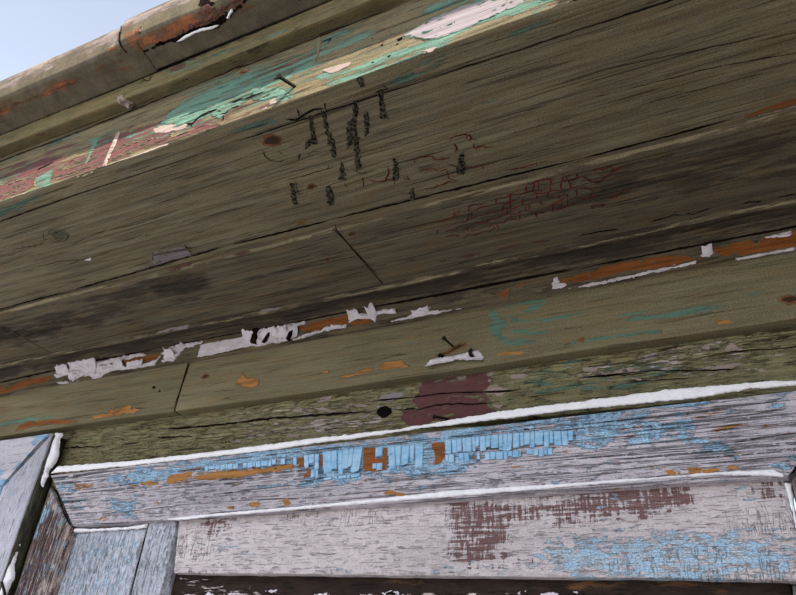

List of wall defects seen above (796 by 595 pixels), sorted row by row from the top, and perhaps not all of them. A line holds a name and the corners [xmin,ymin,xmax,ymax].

peeling [403,0,528,54]
peeling [322,62,351,73]
crack [592,32,796,104]
peeling [51,85,291,179]
hole [304,112,346,180]
hole [346,100,370,171]
crack [0,0,726,309]
crack [0,225,796,395]
peeling [0,230,796,395]
peeling [279,396,337,438]
peeling [347,371,509,427]
peeling [141,428,574,486]